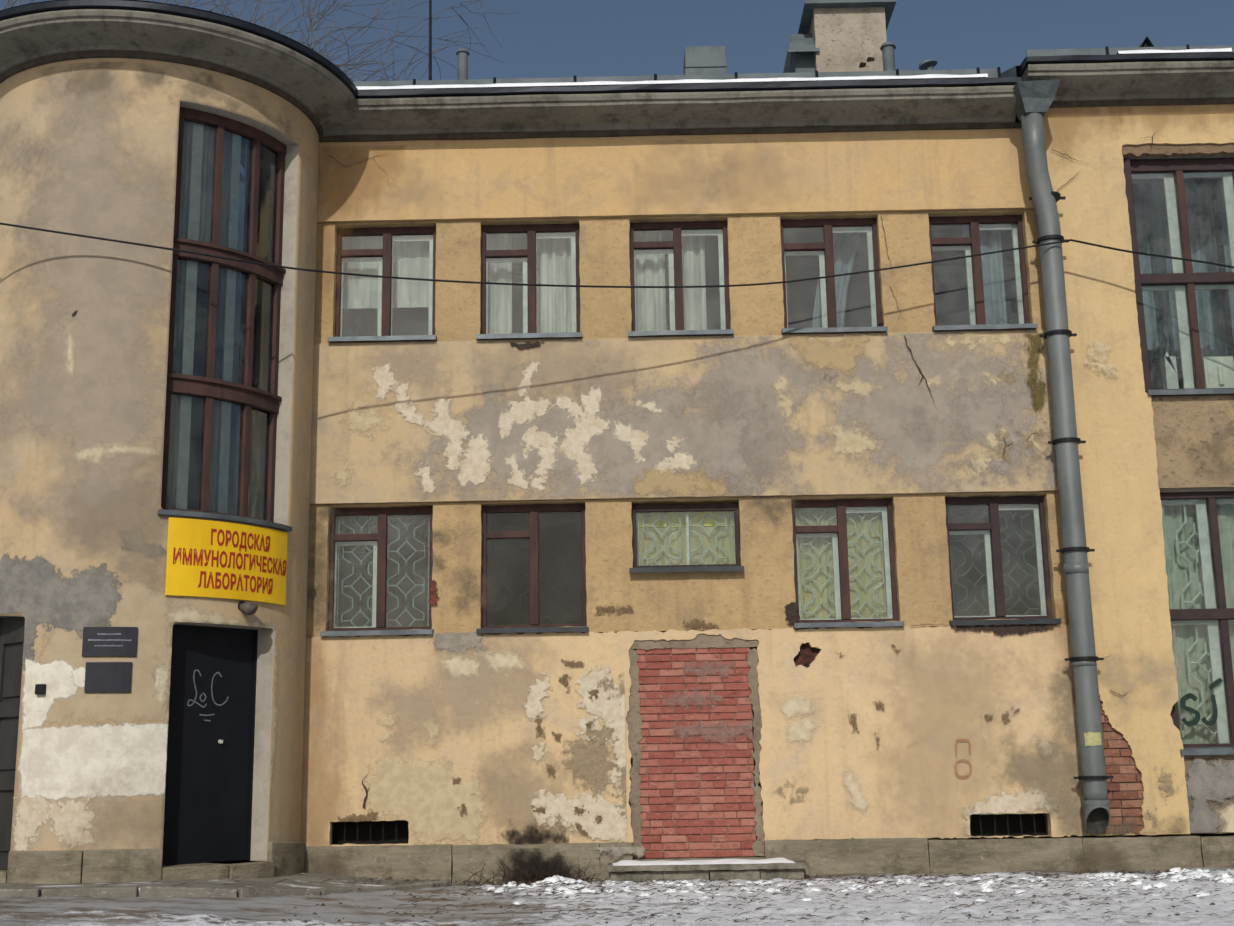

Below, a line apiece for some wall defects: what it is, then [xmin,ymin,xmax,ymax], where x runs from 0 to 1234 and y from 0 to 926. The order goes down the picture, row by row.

crack [881,216,938,411]
leakage [65,325,75,372]
peeling [339,341,697,493]
peeling [168,607,275,630]
peeling [22,659,86,730]
peeling [154,660,169,703]
peeling [441,652,524,678]
spalling [793,643,820,668]
peeling [524,659,645,859]
flaking render [1100,701,1178,834]
peeling [12,794,98,851]
peeling [1220,805,1234,832]